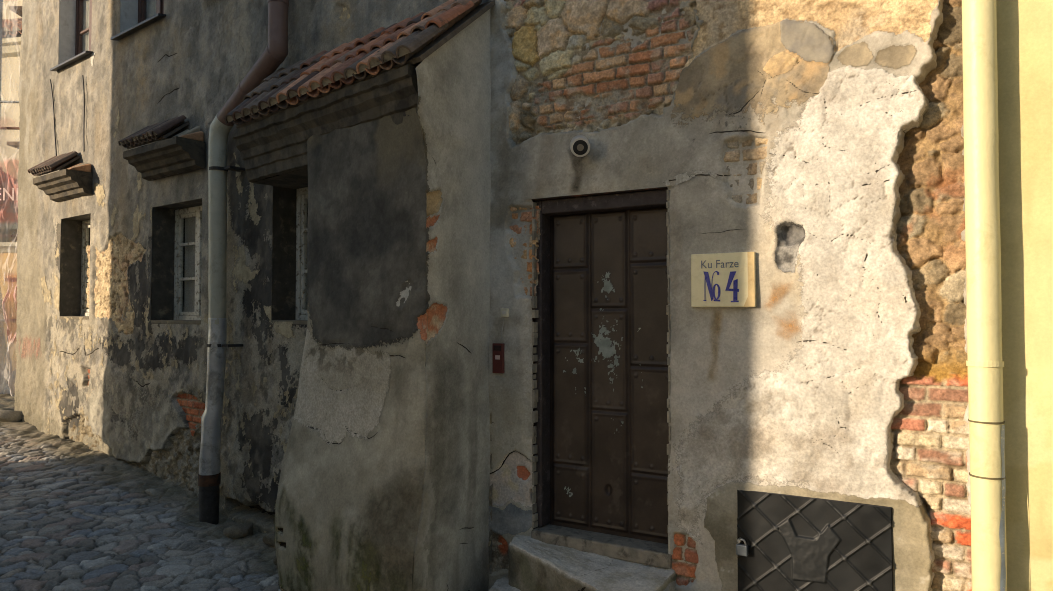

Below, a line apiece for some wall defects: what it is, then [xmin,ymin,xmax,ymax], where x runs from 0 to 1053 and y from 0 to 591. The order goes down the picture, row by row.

flaking render [41,172,208,451]
flaking render [135,389,205,498]
peeling [233,152,261,225]
flaking render [253,301,392,453]
spalling [417,303,447,344]
flaking render [490,452,535,508]
flaking render [504,0,972,591]
crack [709,62,917,453]